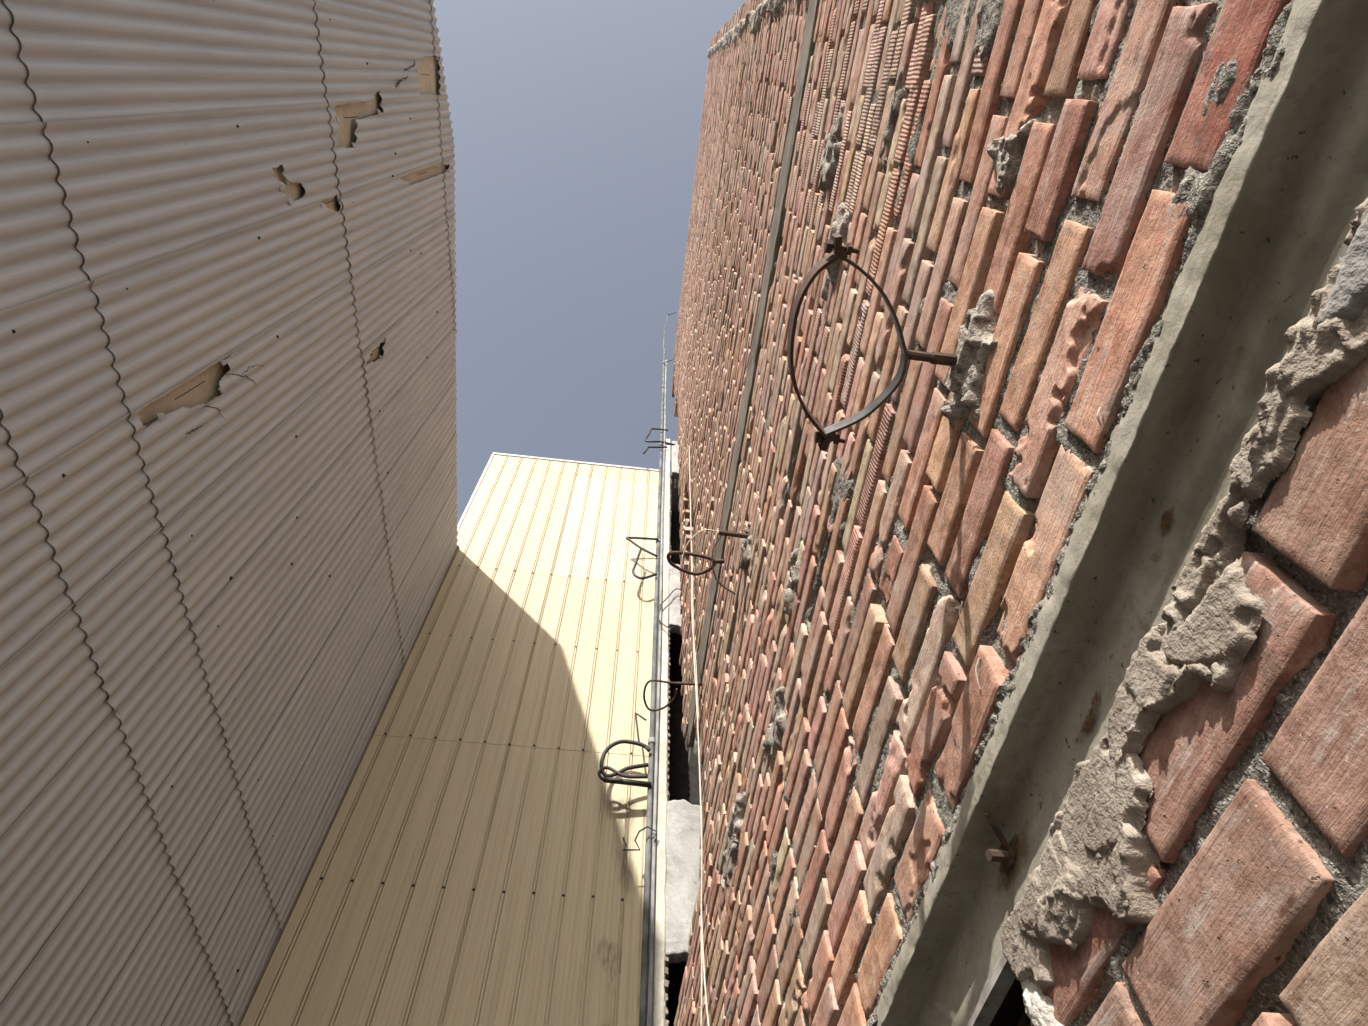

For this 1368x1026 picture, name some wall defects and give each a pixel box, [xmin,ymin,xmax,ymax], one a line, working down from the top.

spalling [415,55,439,95]
spalling [334,91,382,149]
spalling [272,167,304,204]
spalling [401,162,449,185]
spalling [138,352,237,424]
peeling [1001,197,1368,1026]
rust [1082,691,1099,733]